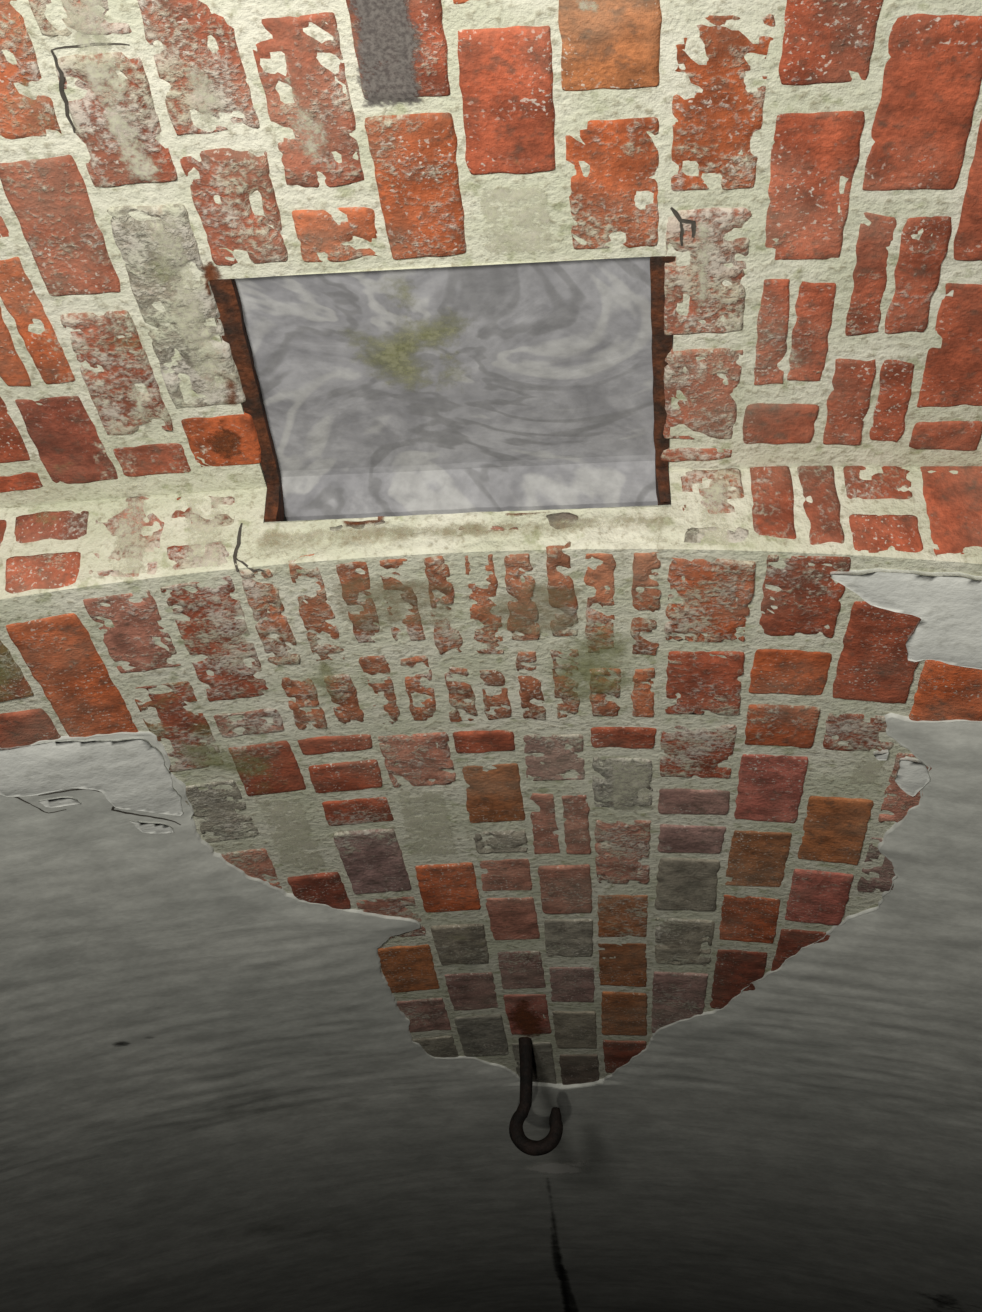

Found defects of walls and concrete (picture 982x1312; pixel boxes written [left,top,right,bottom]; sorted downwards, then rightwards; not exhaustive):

crack [51,43,130,133]
peeling [62,0,159,180]
peeling [297,112,324,157]
peeling [151,220,222,386]
crack [233,523,264,572]
flaking render [0,483,982,1090]